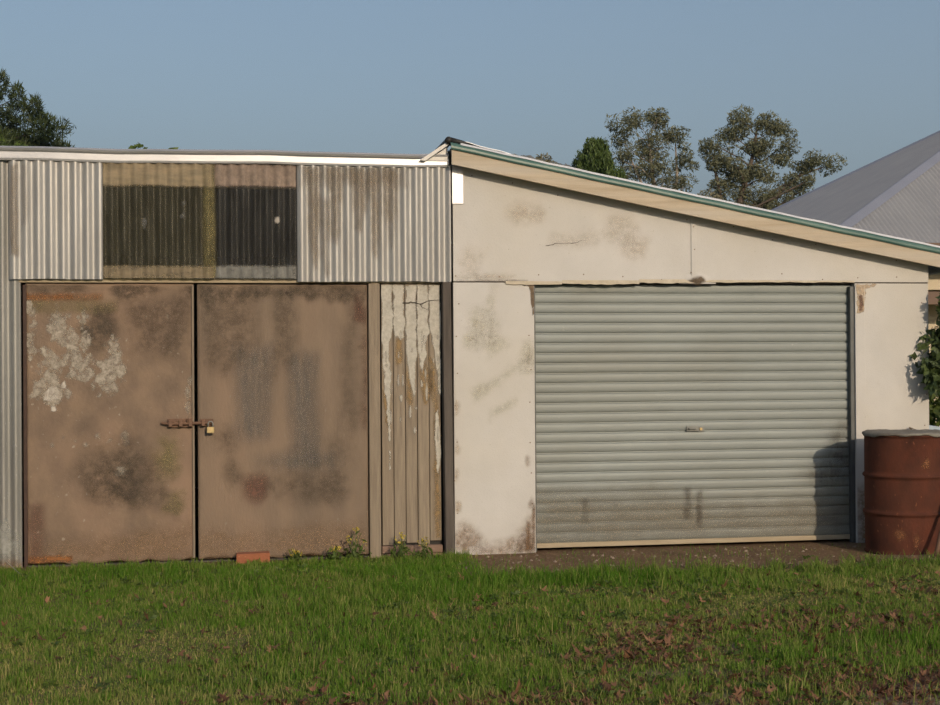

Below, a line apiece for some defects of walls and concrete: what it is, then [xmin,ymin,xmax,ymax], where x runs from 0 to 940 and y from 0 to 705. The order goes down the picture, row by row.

peeling [27,300,126,411]
peeling [381,285,441,537]